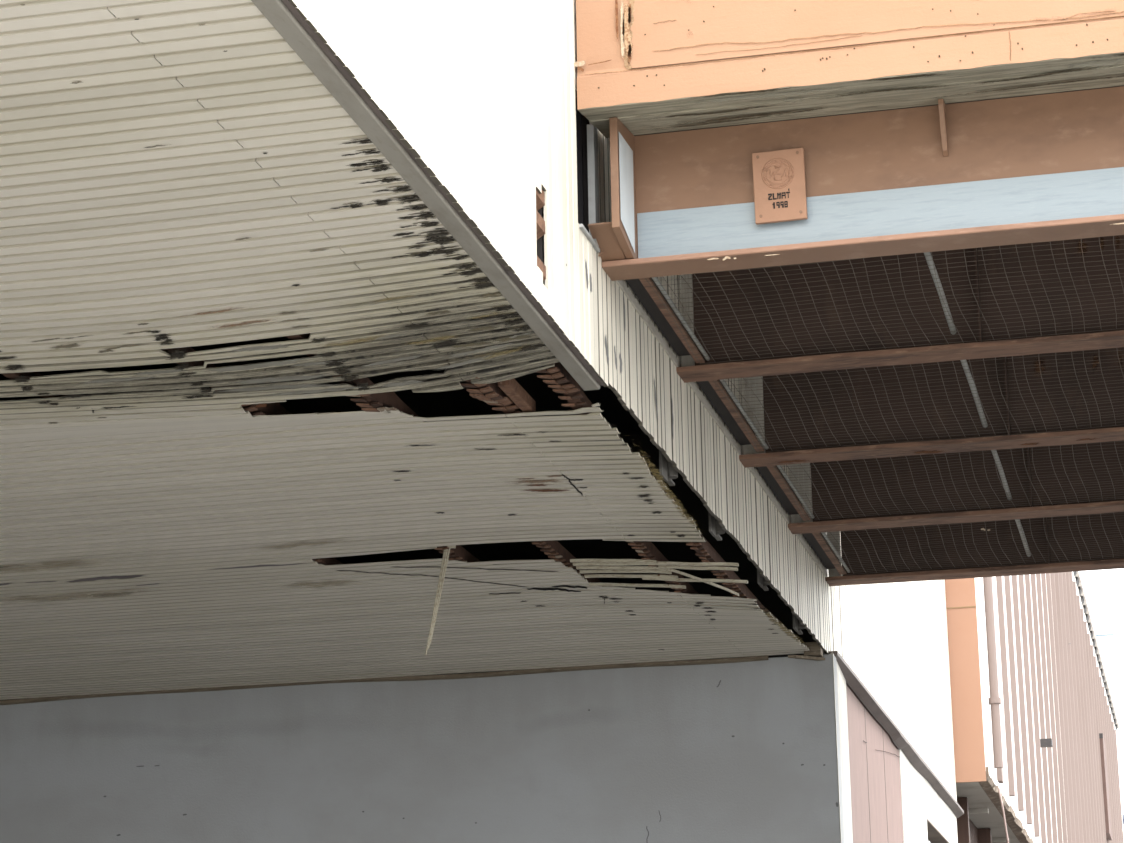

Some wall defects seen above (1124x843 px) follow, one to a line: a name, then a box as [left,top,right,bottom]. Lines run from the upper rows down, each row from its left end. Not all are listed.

water stain [646,54,1124,130]
water stain [331,138,546,358]
peeling [77,370,183,384]
peeling [203,345,362,408]